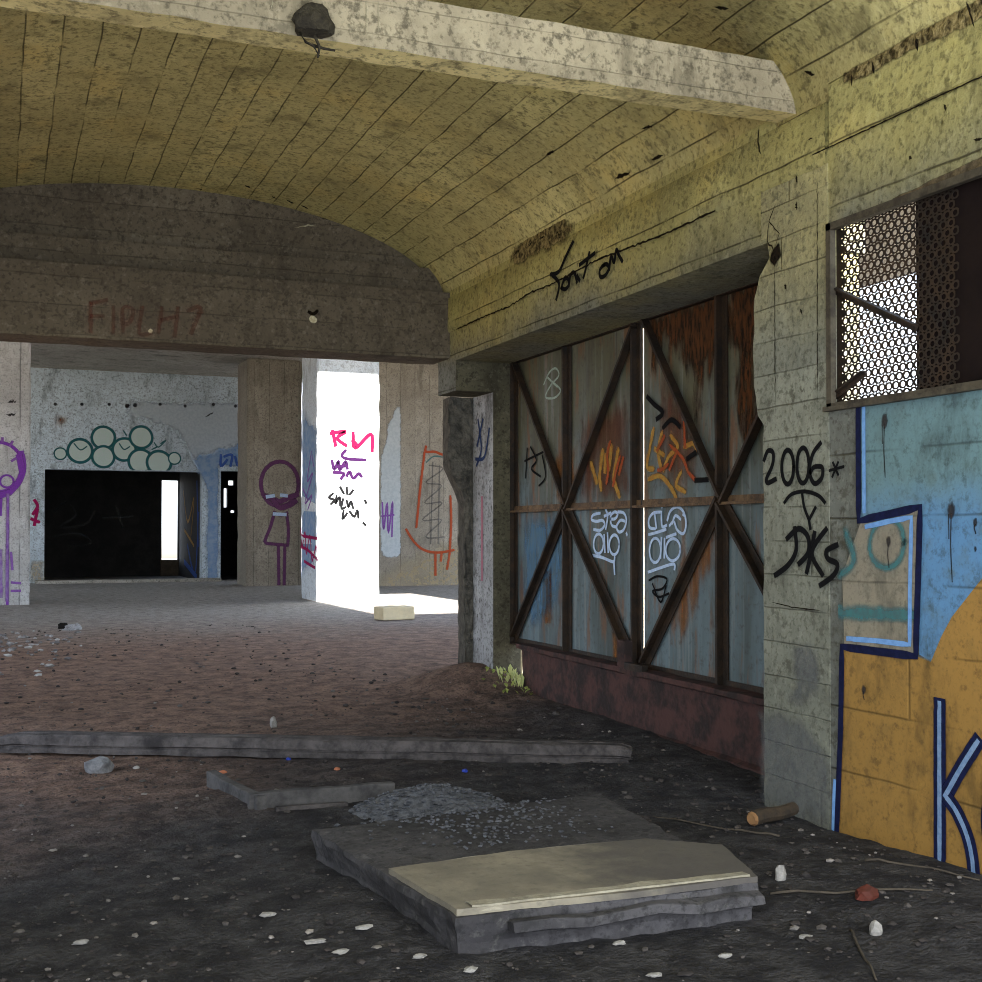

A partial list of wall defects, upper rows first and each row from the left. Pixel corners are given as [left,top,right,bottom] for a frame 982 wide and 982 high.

spalling [843,0,982,83]
spalling [511,219,573,264]
corrosion [651,300,714,473]
corrosion [728,285,758,440]
corrosion [556,411,626,496]
corrosion [679,540,710,632]